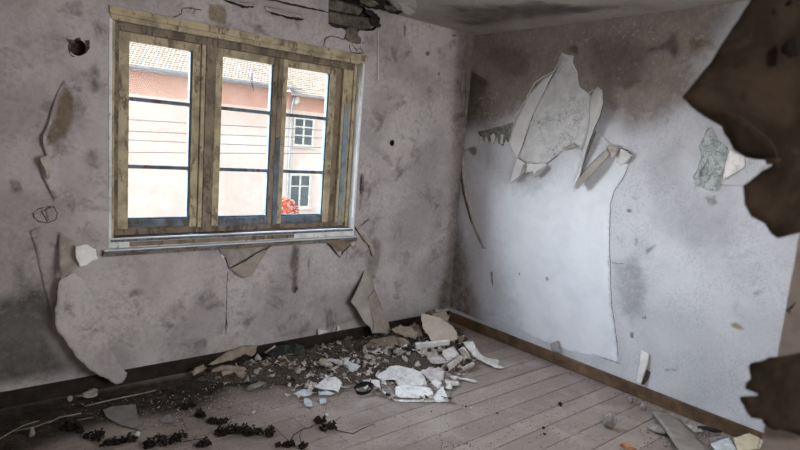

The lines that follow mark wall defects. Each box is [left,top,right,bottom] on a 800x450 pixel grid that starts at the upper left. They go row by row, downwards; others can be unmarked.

spalling [66,38,90,57]
spalling [328,0,417,44]
damp [693,127,729,191]
peeling [464,52,632,364]